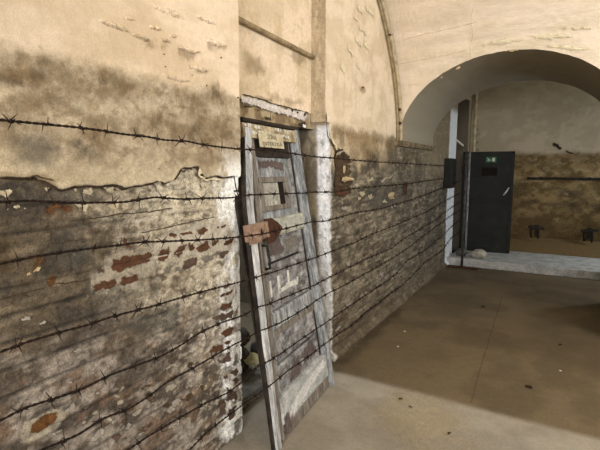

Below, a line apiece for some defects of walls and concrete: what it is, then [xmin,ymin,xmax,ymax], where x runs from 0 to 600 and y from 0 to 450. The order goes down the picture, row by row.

flaking render [334,149,373,201]
flaking render [91,219,235,294]
flaking render [188,283,239,420]
peeling [84,386,142,442]
peeling [164,376,210,413]